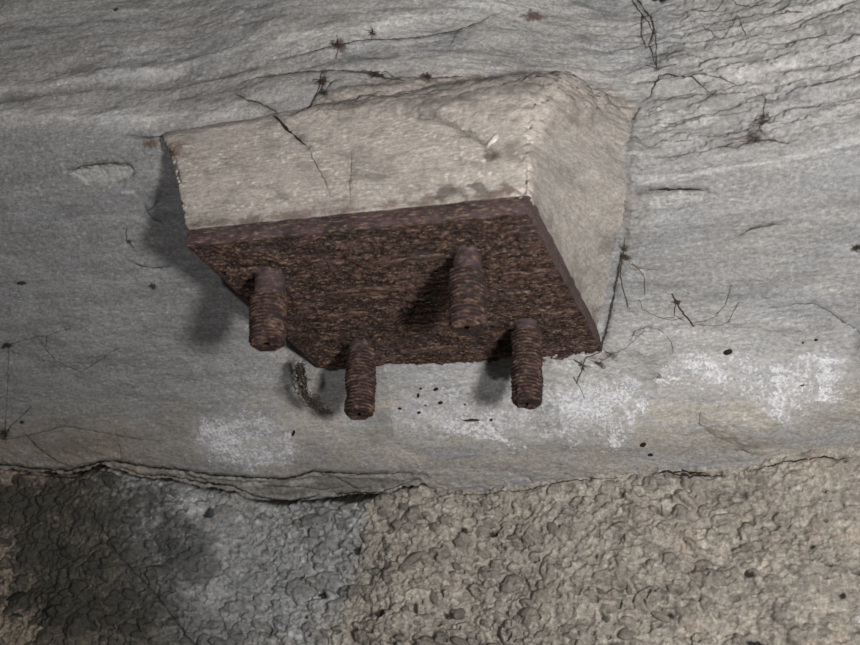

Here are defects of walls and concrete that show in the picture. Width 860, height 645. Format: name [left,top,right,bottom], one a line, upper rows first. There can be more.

crack [238,12,501,196]
crack [631,0,788,148]
crack [649,185,706,193]
crack [601,251,622,348]
crack [775,303,860,333]
water stain [390,329,856,450]
water stain [192,410,304,472]
crack [0,426,723,501]
crack [752,455,851,470]
water stain [0,471,188,645]